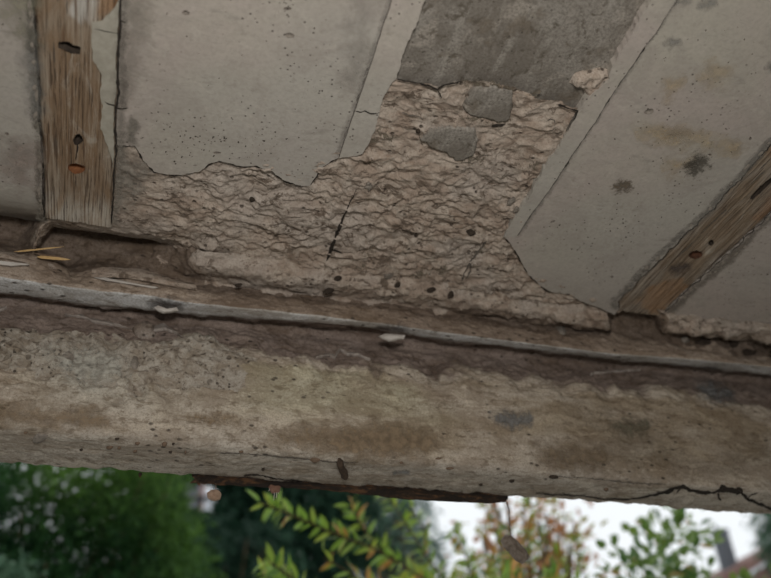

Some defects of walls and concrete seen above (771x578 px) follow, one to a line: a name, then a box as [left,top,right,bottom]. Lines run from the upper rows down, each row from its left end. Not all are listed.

crack [97,0,392,224]
spalling [51,79,598,309]
crack [326,189,357,261]
damp [613,181,634,194]
damp [684,154,712,177]
crack [536,476,771,511]